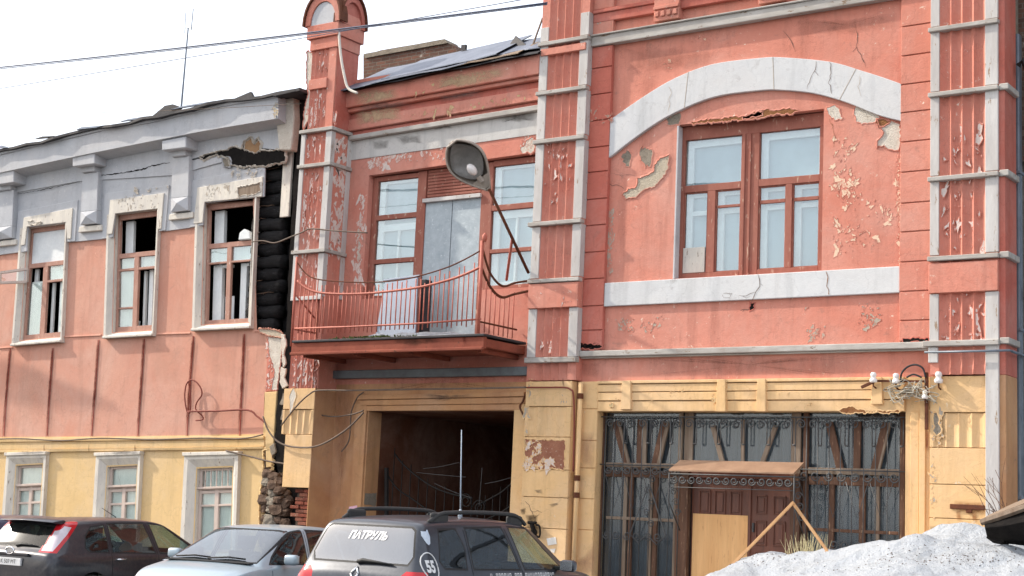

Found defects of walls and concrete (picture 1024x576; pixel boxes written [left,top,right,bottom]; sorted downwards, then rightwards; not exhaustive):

crack [101,153,223,176]
spalling [199,50,367,291]
spalling [607,145,671,276]
spalling [666,106,800,127]
spalling [826,104,901,266]
peeling [941,121,985,261]
peeling [941,292,985,347]
spalling [258,327,320,416]
spalling [522,379,567,476]
spalling [838,405,901,415]
spalling [928,403,945,520]